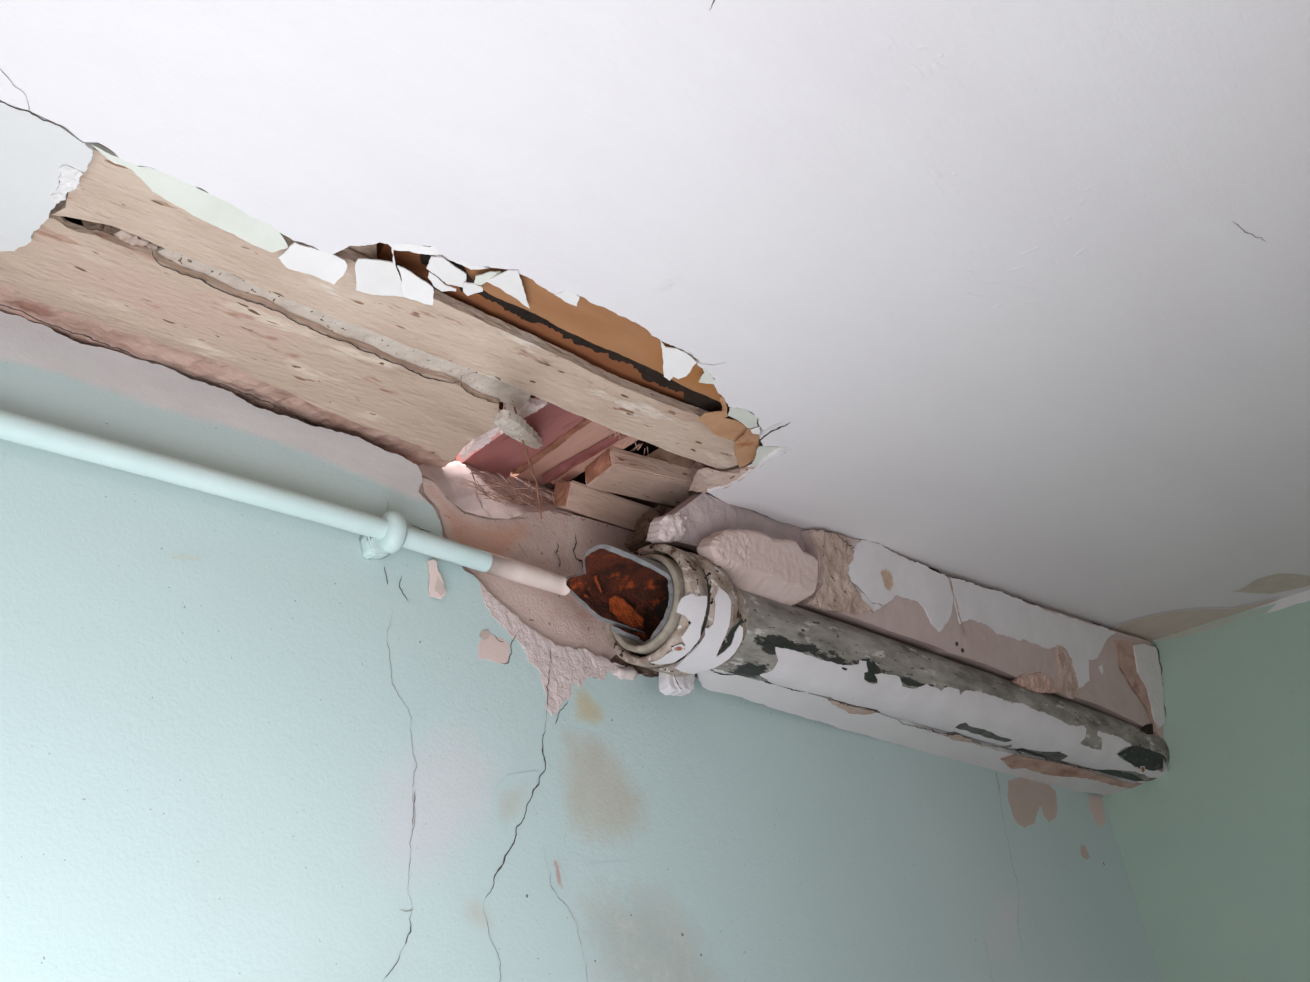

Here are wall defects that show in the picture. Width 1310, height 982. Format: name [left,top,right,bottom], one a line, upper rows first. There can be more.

crack [0,69,82,142]
peeling [278,242,530,309]
peeling [660,340,714,384]
spalling [460,425,504,460]
spalling [478,582,625,716]
rust [581,574,658,630]
peeling [717,618,744,656]
peeling [842,658,948,691]
crack [383,567,417,981]
peeling [946,722,1143,828]
crack [483,649,587,981]
water stain [345,682,734,982]